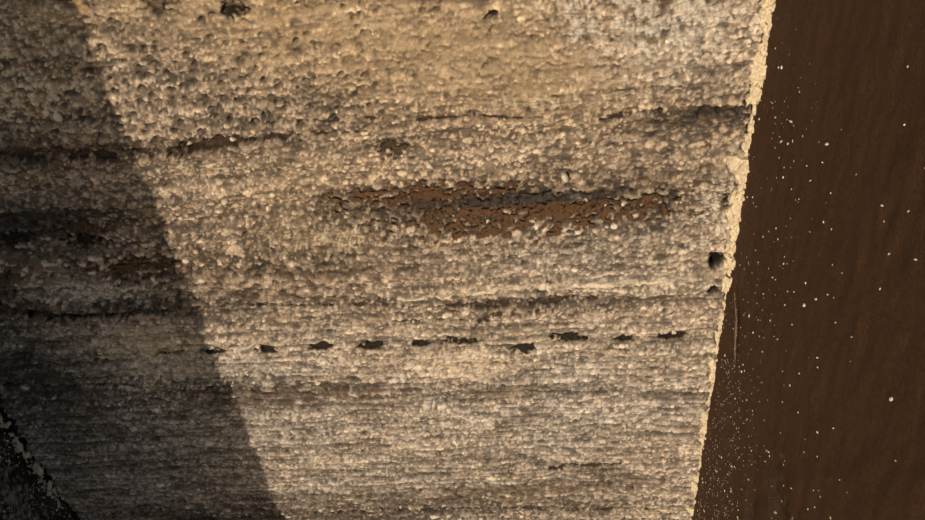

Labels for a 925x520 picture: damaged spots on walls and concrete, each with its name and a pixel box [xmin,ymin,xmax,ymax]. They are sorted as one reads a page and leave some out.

corrosion [307,176,712,253]
crack [0,303,145,319]